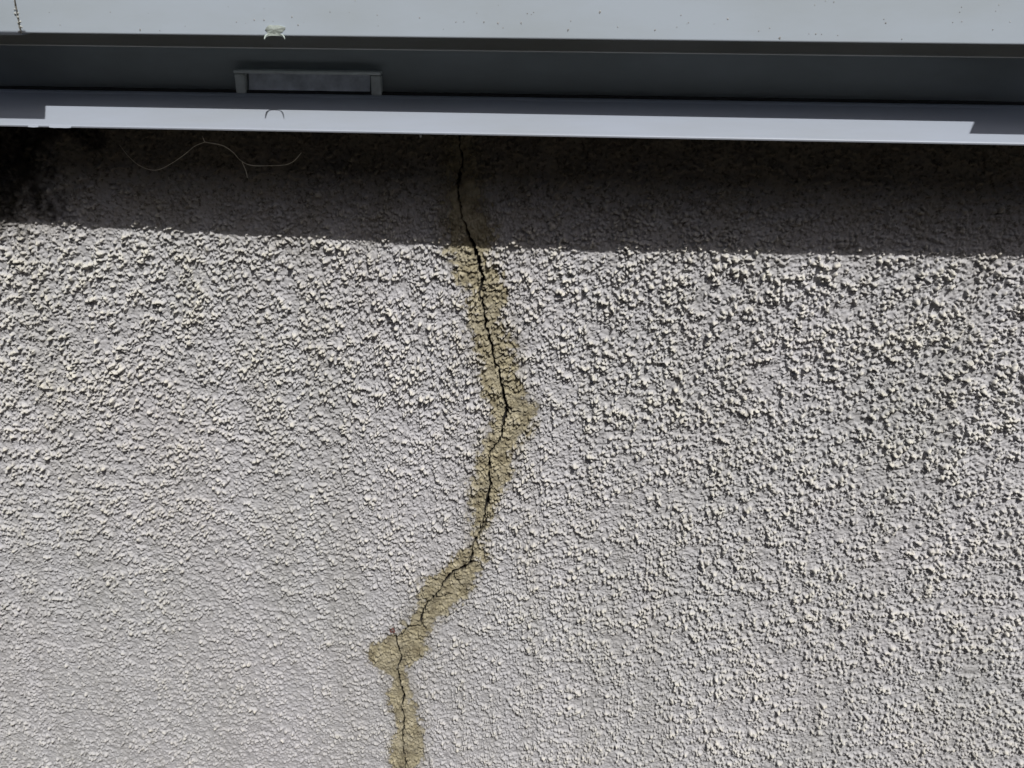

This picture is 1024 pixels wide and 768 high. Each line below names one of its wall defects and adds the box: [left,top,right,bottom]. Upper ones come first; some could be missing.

crack [385,135,519,766]